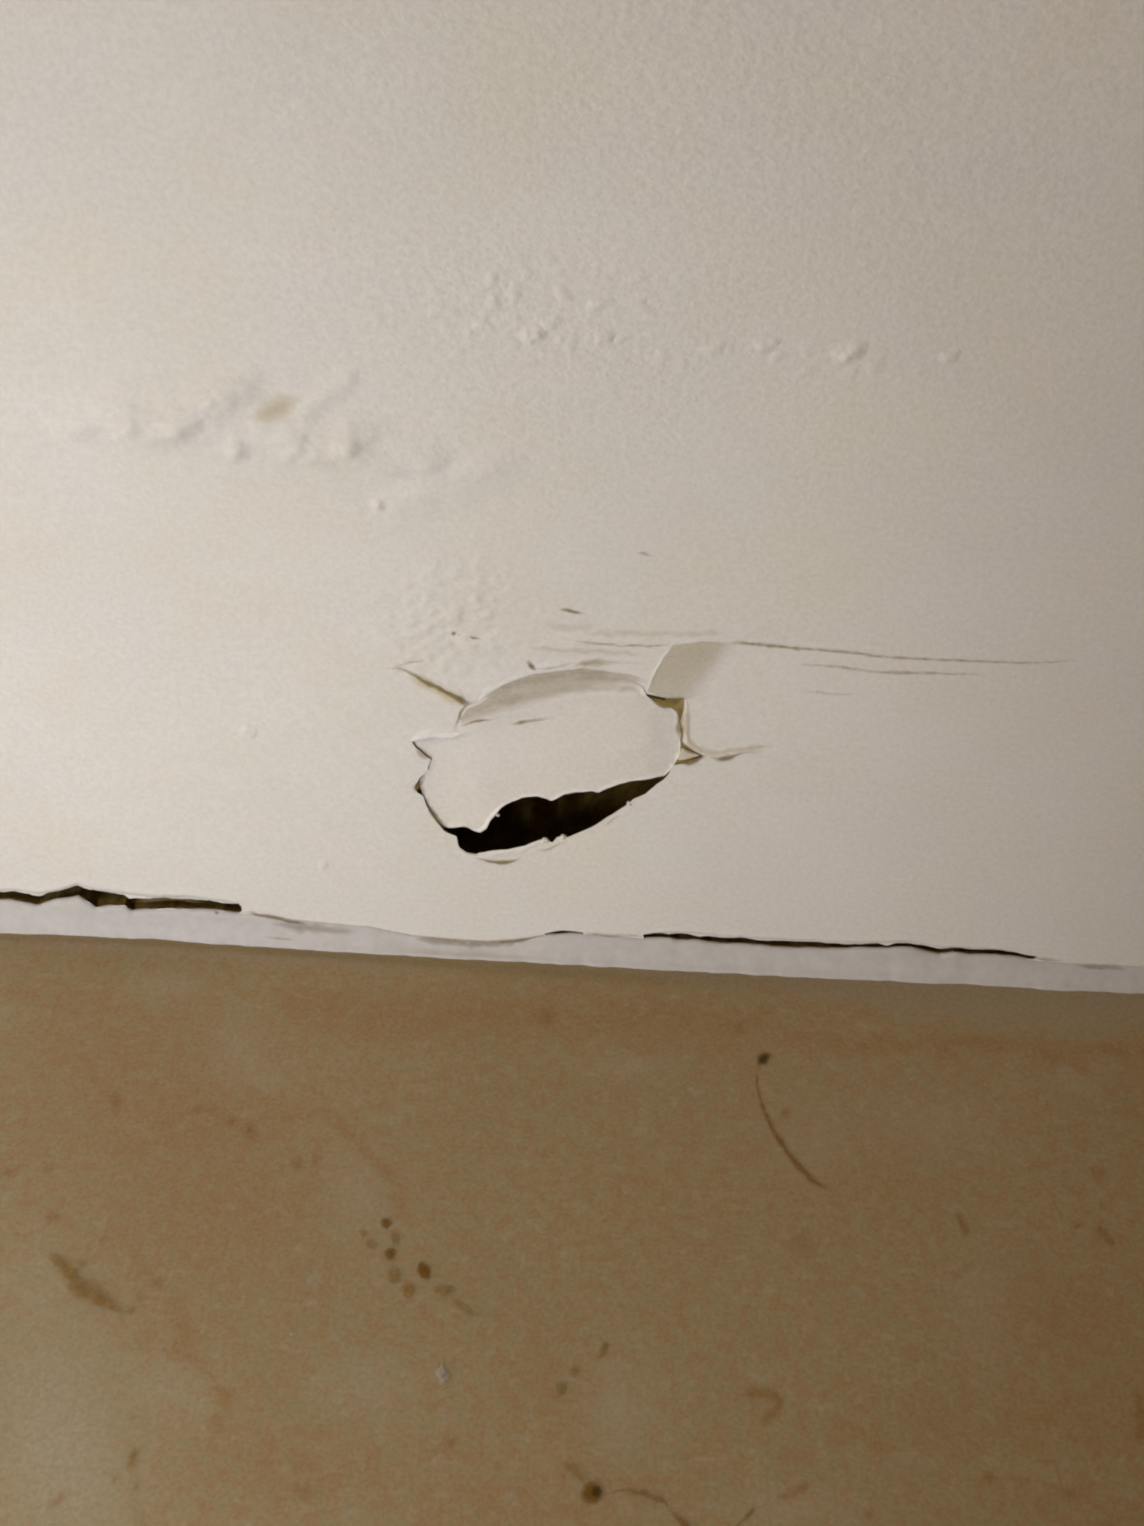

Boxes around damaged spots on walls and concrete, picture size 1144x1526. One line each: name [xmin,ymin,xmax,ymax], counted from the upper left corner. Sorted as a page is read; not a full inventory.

flaking render [410,642,735,864]
crack [0,875,298,923]
crack [505,930,583,943]
crack [643,927,1037,959]